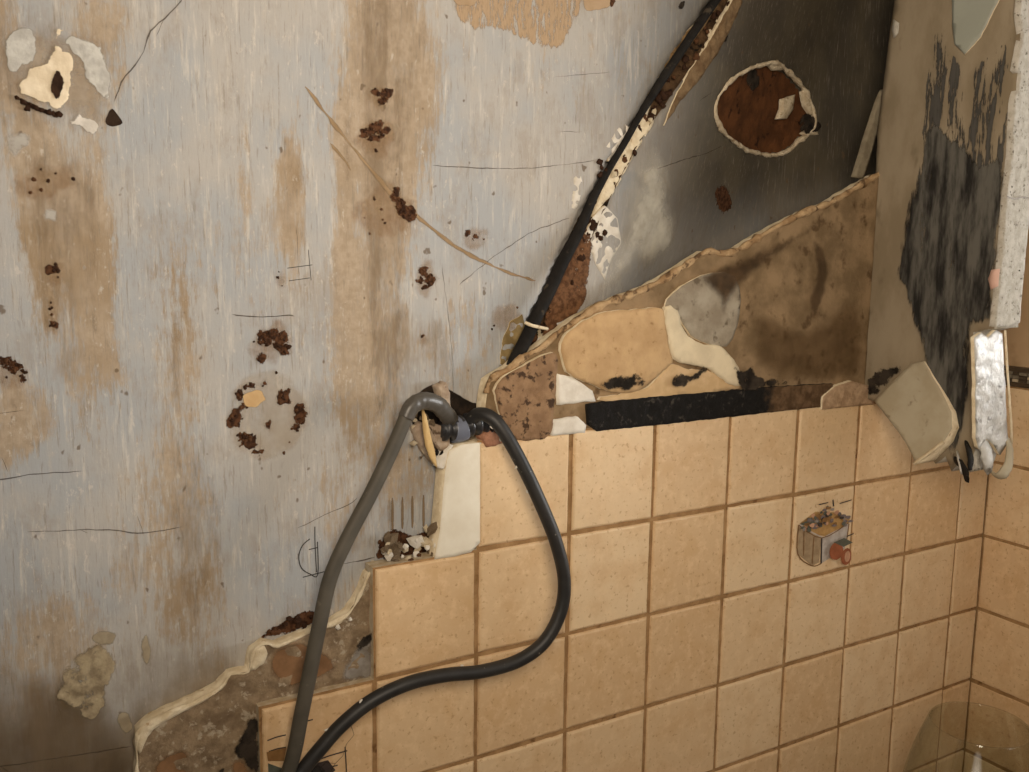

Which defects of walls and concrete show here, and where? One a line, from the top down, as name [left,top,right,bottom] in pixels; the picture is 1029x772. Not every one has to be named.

spalling [6,28,122,134]
crack [114,0,182,101]
peeling [454,0,615,47]
spalling [714,60,821,158]
spalling [483,172,880,393]
damp [898,35,1008,456]
peeling [988,269,1000,290]
peeling [57,631,116,719]
peeling [117,624,312,772]
peeling [314,560,377,690]